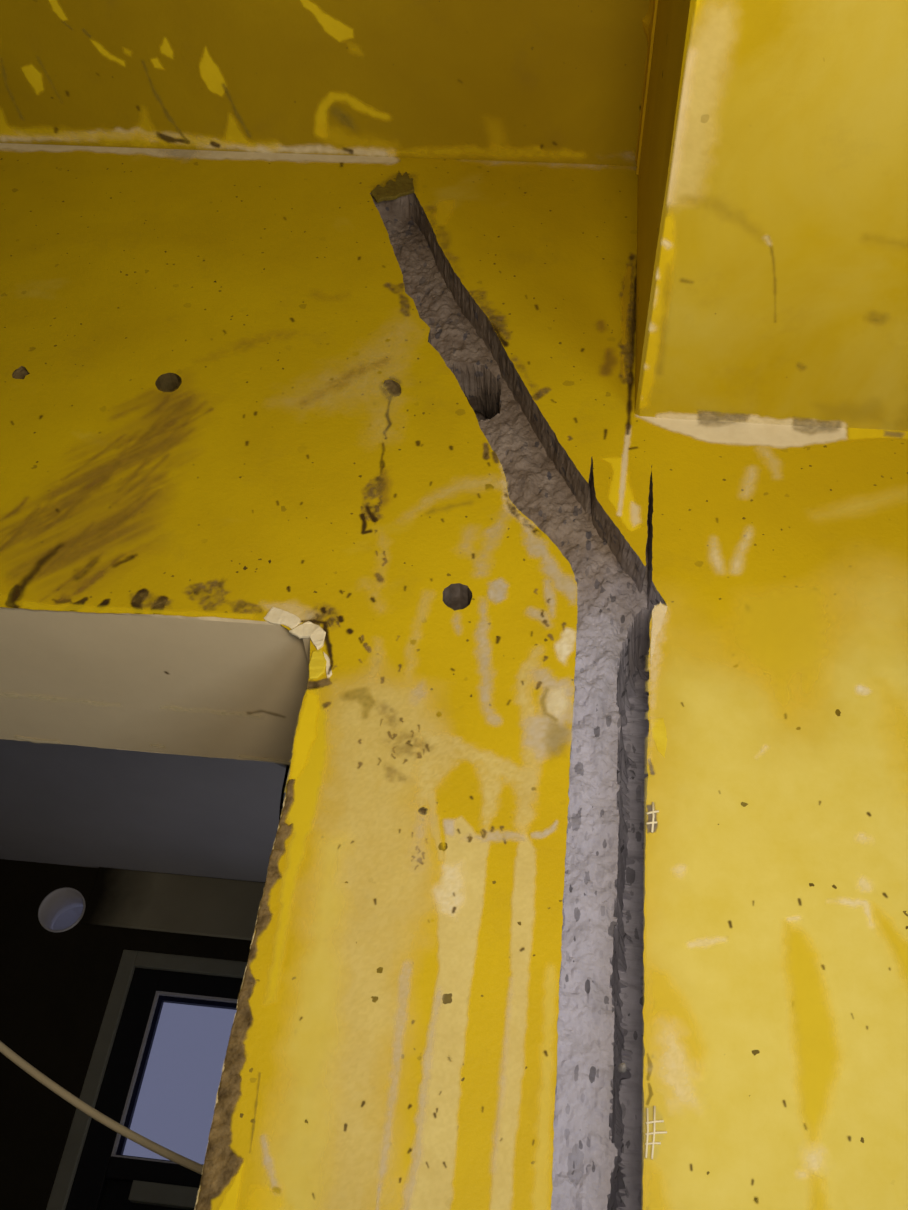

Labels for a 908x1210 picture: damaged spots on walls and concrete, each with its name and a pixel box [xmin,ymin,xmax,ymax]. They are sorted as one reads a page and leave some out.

spalling [195,756,295,1210]
spalling [264,607,362,690]
peeling [252,682,462,1210]
leakage [405,648,542,1210]
leakage [478,605,500,723]
flaking render [479,821,558,841]
flaking render [637,412,847,448]
peeling [646,581,908,1210]